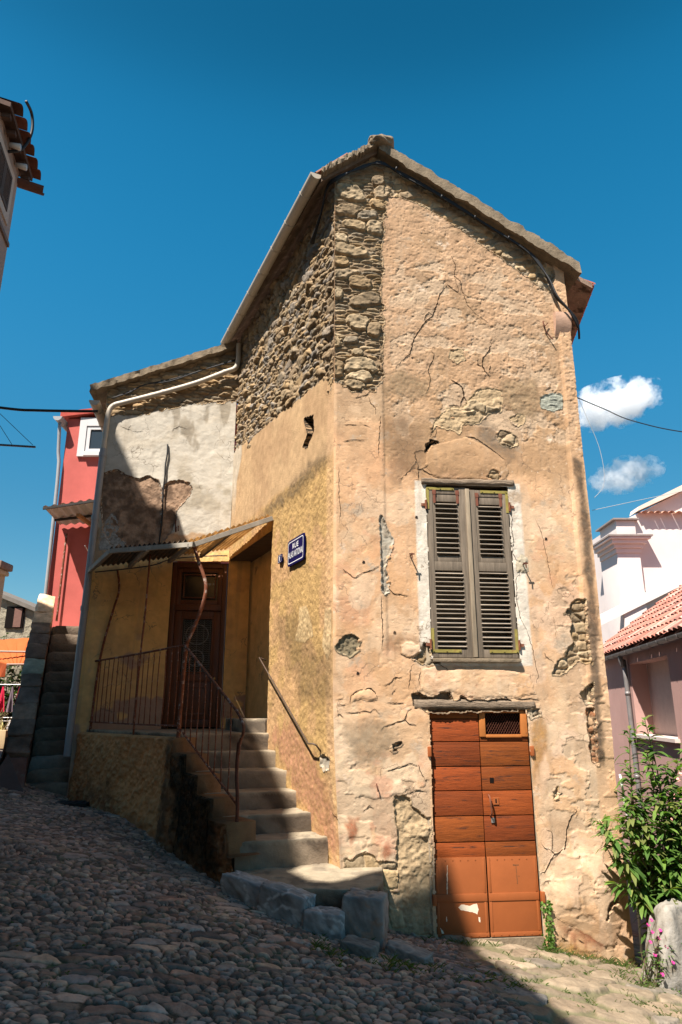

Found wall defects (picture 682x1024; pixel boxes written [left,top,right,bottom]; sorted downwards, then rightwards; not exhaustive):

crack [396,256,492,408]
peeling [424,387,526,453]
peeling [100,469,193,548]
peeling [379,515,394,595]
peeling [334,633,362,658]
peeling [551,598,593,676]
peeling [578,682,600,767]
crack [537,811,577,884]